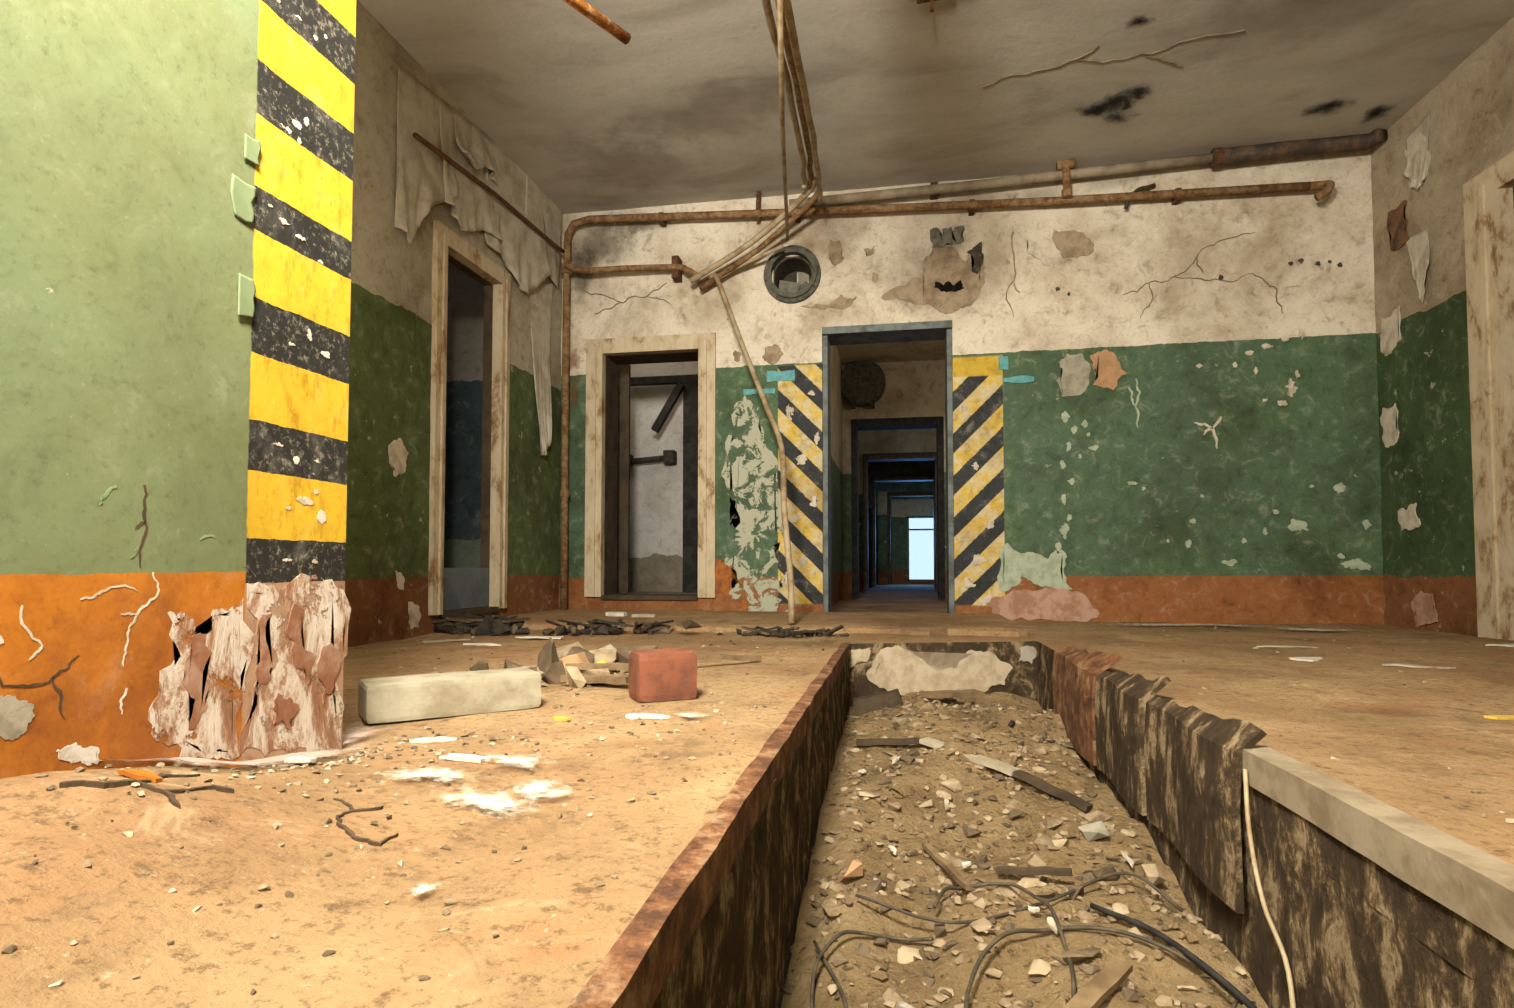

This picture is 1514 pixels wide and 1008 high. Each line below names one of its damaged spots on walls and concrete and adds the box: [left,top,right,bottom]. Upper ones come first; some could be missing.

damp [1080,87,1148,121]
peeling [394,65,562,456]
flaking render [864,225,985,314]
peeling [0,695,35,741]
flaking render [148,558,351,764]
peeling [721,395,820,612]
peeling [964,350,1127,622]
peeling [1221,510,1309,566]
peeling [1262,370,1300,406]
peeling [1337,553,1371,571]
spalling [679,645,1054,1008]
spalling [1082,757,1514,1008]